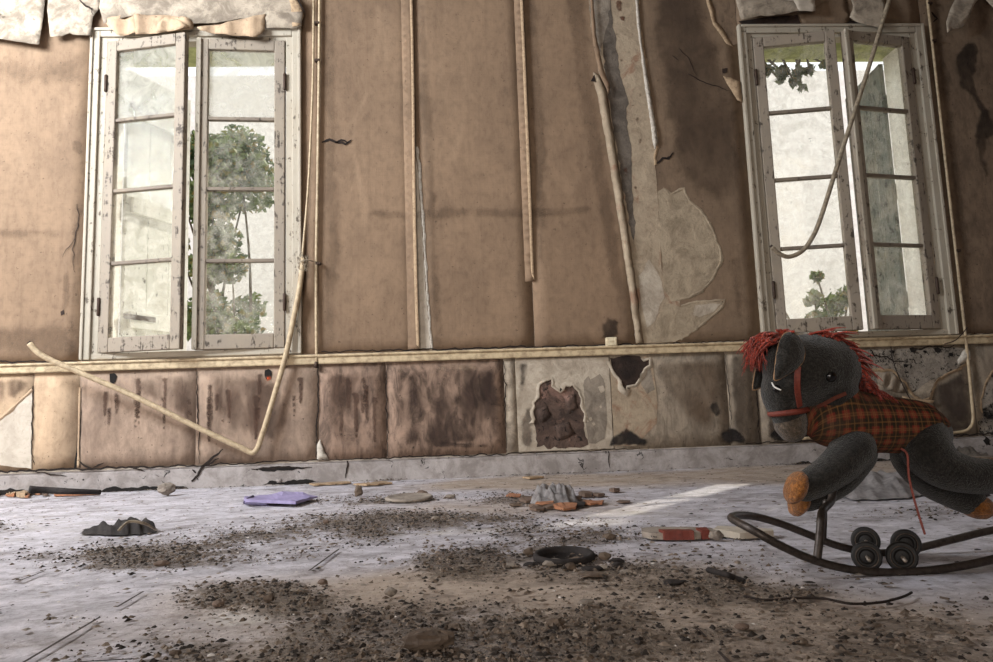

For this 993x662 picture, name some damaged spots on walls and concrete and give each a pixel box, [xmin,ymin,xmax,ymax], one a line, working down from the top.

peeling [0,0,305,45]
peeling [946,0,993,33]
damp [957,44,993,141]
peeling [514,0,535,282]
flaking render [589,0,725,343]
damp [103,392,119,424]
damp [207,385,235,442]
damp [248,374,279,439]
damp [331,376,377,442]
damp [407,370,496,447]
flaking render [515,355,658,452]
flaking render [978,370,993,445]